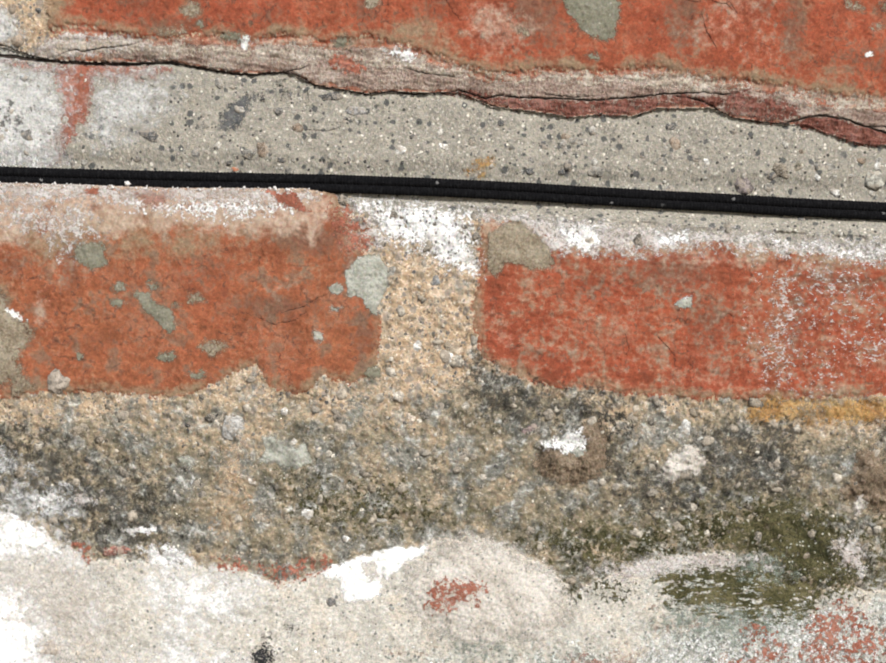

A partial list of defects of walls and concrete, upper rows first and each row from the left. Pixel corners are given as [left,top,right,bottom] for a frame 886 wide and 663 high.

crack [0,42,886,134]
peeling [586,551,783,583]
peeling [831,534,869,578]